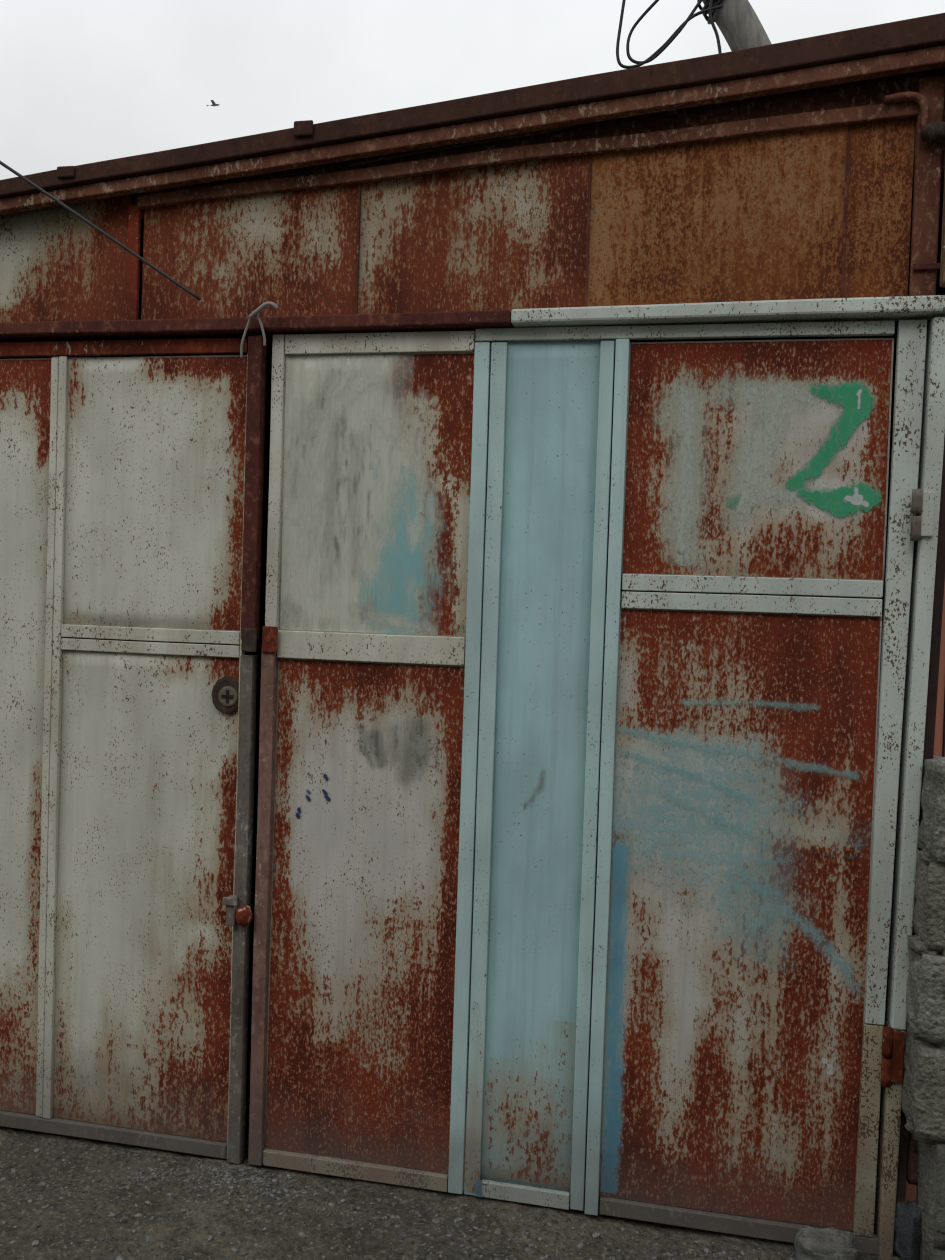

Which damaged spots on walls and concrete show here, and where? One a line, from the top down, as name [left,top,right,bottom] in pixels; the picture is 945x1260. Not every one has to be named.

rust [0,117,915,322]
rust [0,359,51,473]
rust [68,359,86,433]
rust [141,356,247,631]
rust [385,354,474,636]
rust [622,340,892,580]
rust [149,655,240,699]
rust [0,761,43,1114]
rust [54,710,238,1142]
rust [266,659,573,1193]
rust [600,609,881,1231]